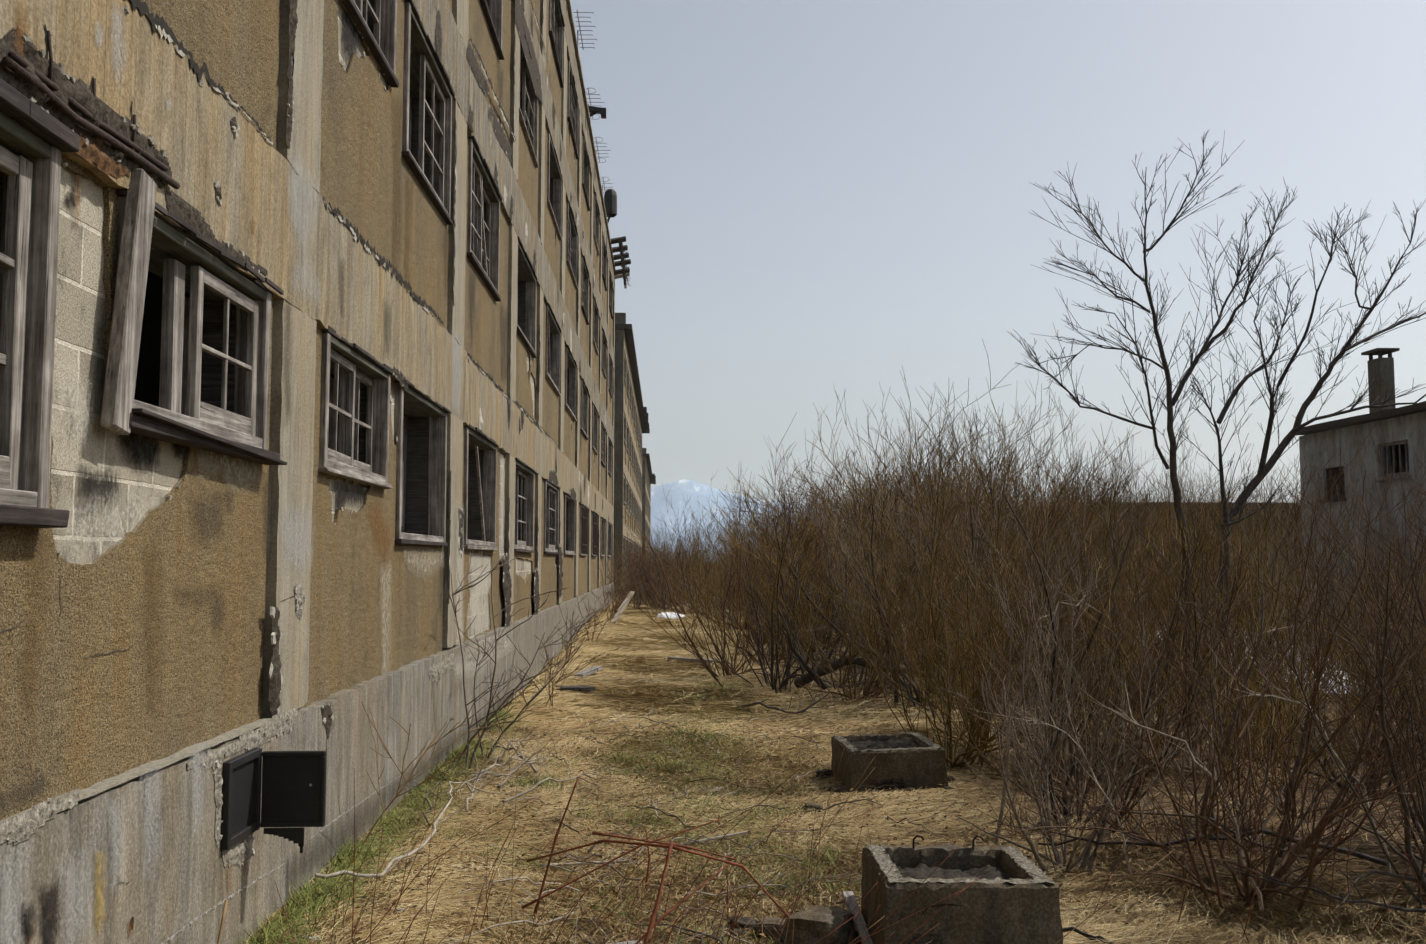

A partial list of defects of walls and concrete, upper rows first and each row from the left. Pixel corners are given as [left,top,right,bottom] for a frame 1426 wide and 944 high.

spalling [0,27,267,565]
peeling [270,606,282,645]
spalling [188,662,298,868]
spalling [0,788,80,845]
water stain [22,885,60,944]